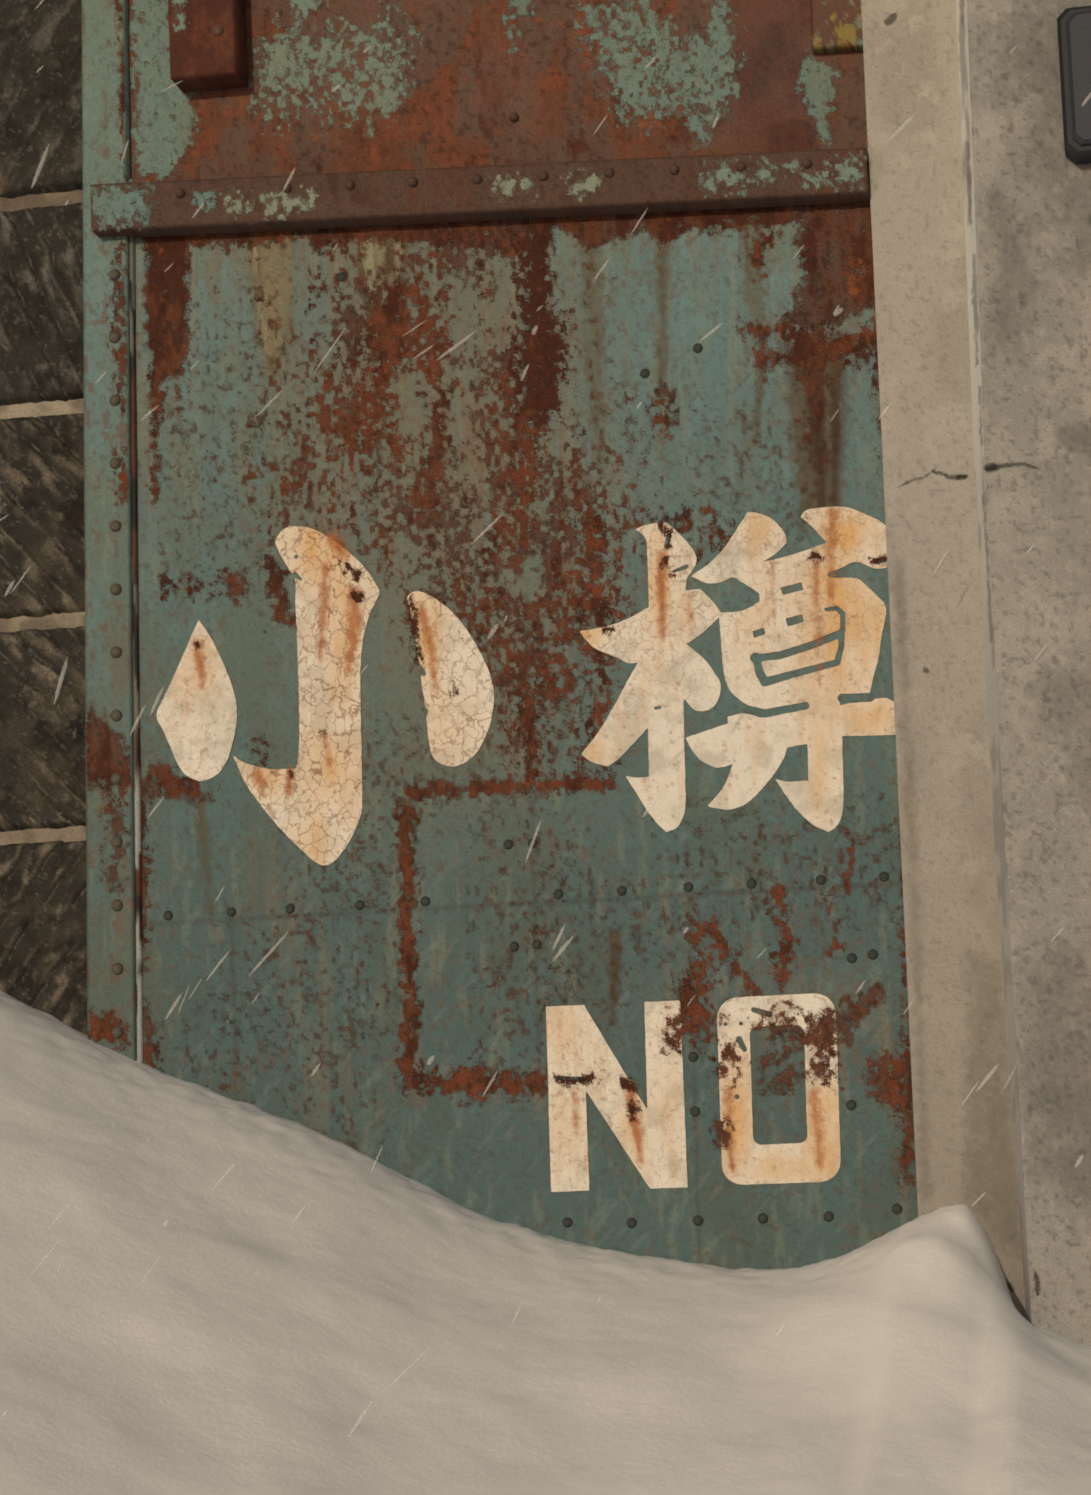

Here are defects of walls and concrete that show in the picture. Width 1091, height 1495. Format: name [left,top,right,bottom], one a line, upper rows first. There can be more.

peeling [500,0,536,54]
rust [113,0,125,183]
peeling [566,0,872,198]
peeling [190,183,319,224]
peeling [486,171,539,203]
peeling [560,167,604,203]
crack [903,462,1038,485]
rust [85,202,916,1194]